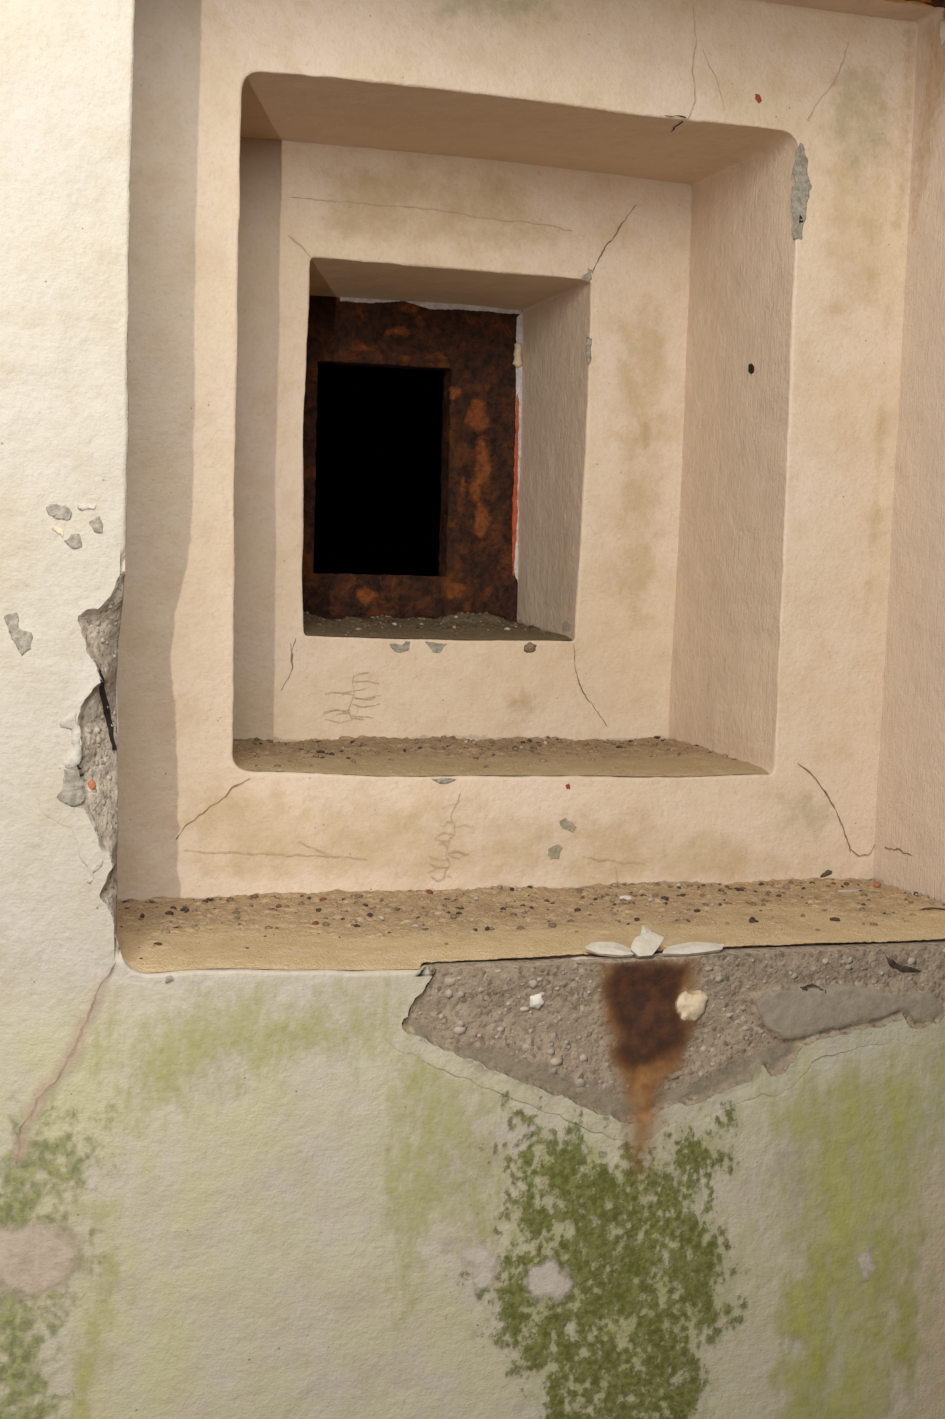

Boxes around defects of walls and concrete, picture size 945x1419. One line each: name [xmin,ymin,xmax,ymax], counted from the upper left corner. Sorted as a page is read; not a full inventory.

rust [887,0,945,45]
spalling [790,143,812,240]
rust [451,388,491,537]
peeling [46,504,103,549]
peeling [4,613,33,655]
rust [357,588,377,604]
spalling [39,544,126,969]
crack [798,763,911,857]
crack [15,962,116,1163]
rust [606,962,691,1145]
spalling [381,932,945,1141]